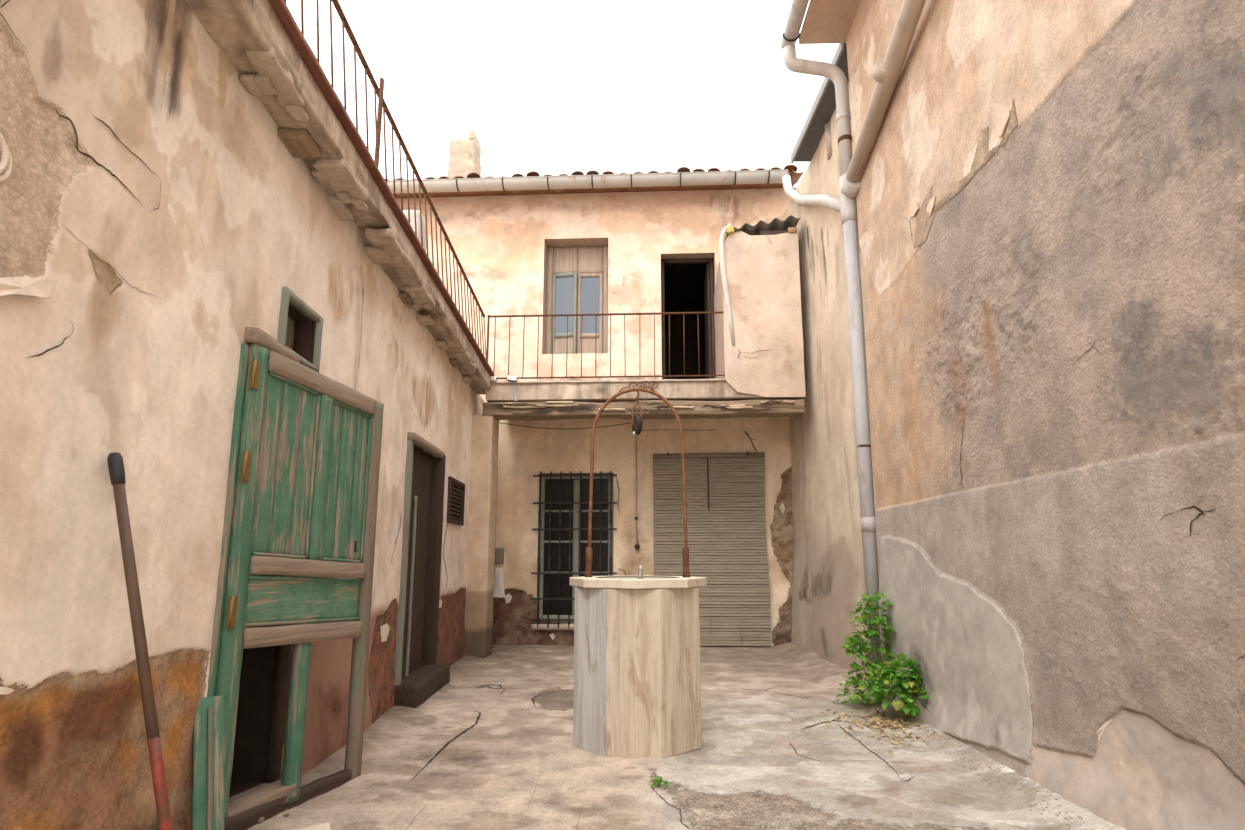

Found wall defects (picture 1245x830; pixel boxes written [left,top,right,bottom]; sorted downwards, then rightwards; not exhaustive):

spalling [0,23,96,297]
crack [56,110,161,210]
peeling [909,99,1017,248]
crack [27,325,74,358]
spalling [769,466,794,646]
crack [1161,506,1217,535]
peeling [0,648,210,830]
crack [366,685,560,830]
peeling [1024,709,1245,830]